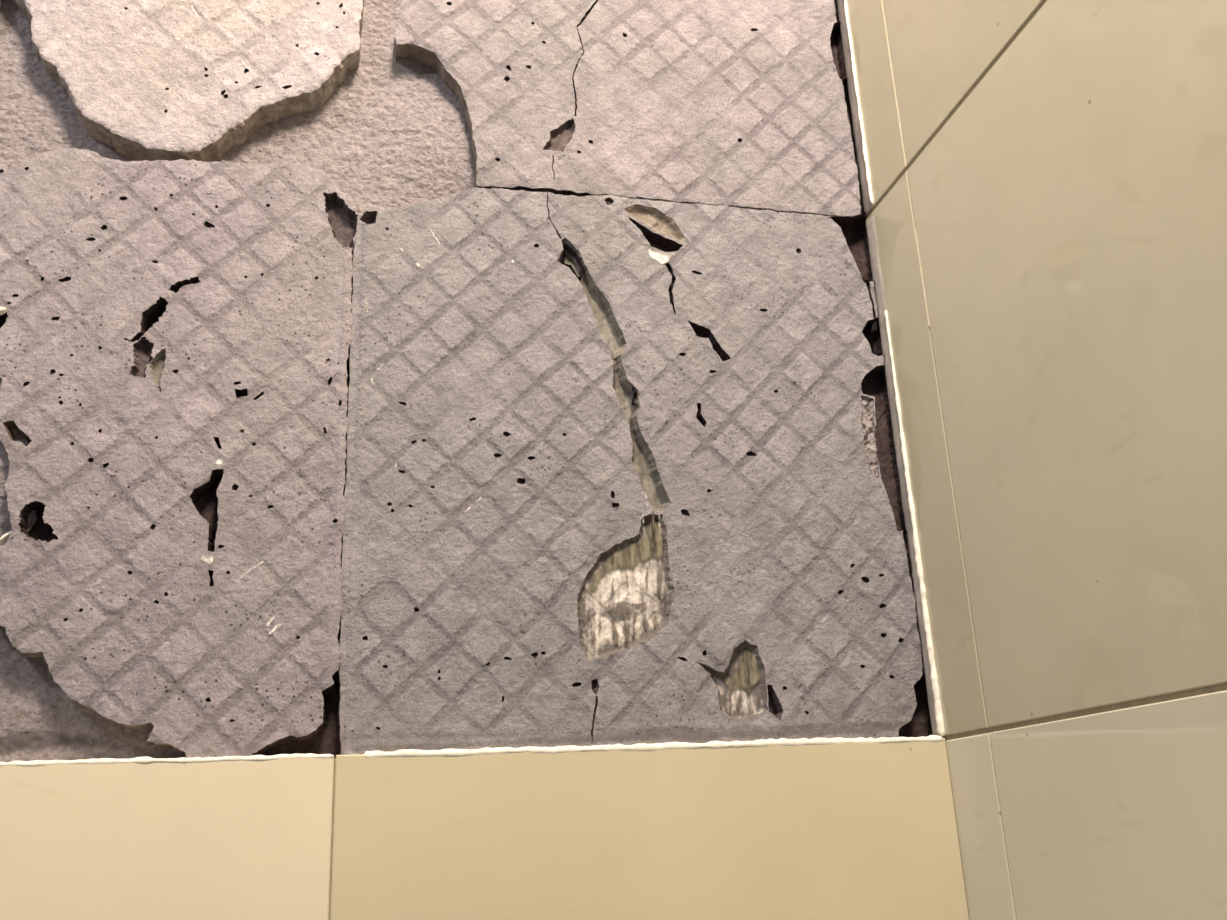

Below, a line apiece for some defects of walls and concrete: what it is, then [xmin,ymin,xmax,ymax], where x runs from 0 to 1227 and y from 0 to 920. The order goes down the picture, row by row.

spalling [0,0,137,173]
spalling [213,0,475,255]
crack [572,0,598,116]
crack [625,197,827,216]
crack [479,155,670,513]
crack [664,263,731,361]
crack [696,403,706,427]
spalling [0,420,37,546]
spalling [577,495,674,662]
spalling [0,626,186,762]
spalling [678,640,787,721]